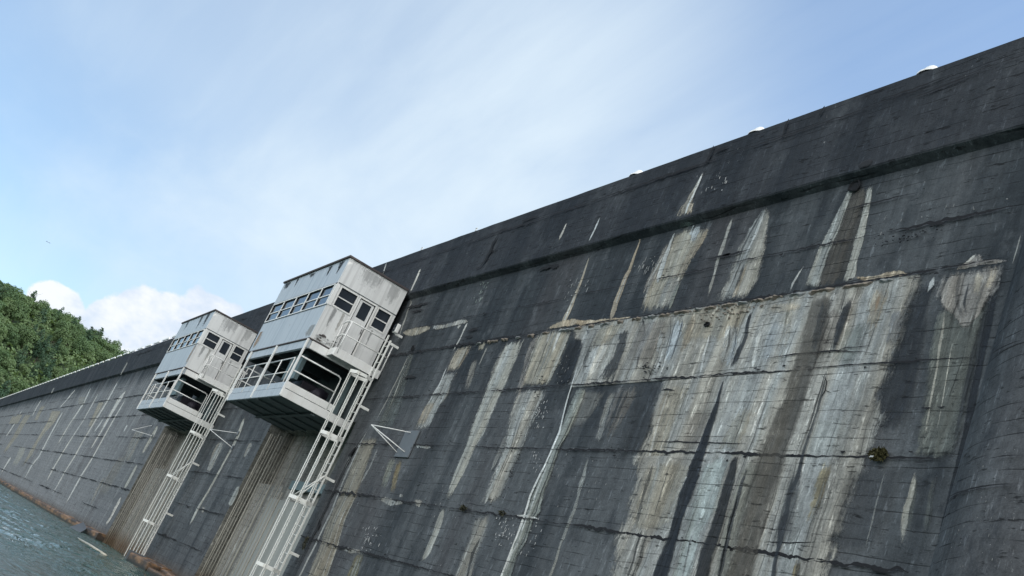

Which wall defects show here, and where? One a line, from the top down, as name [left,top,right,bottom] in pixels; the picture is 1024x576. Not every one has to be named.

crack [0,379,157,509]
leakage [423,511,444,559]
leakage [400,269,487,428]
crack [294,429,941,576]
leakage [448,175,1021,576]